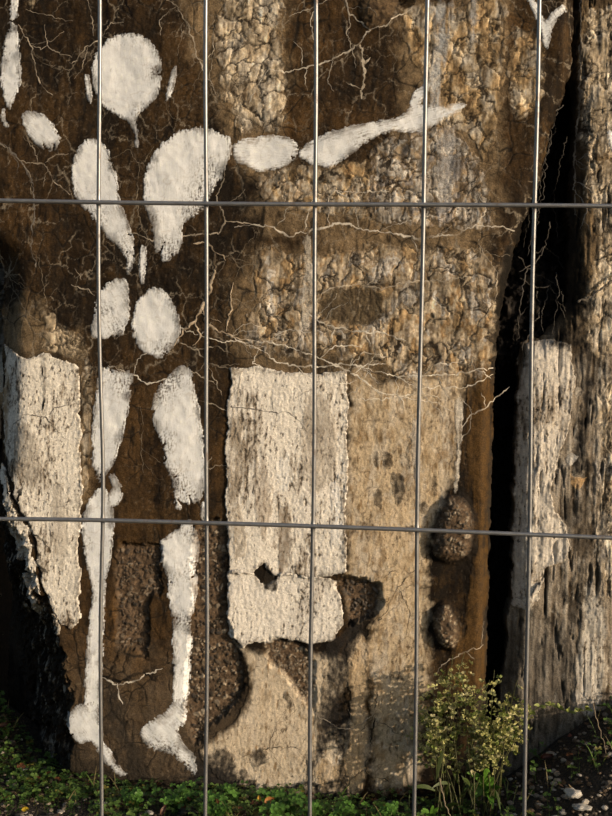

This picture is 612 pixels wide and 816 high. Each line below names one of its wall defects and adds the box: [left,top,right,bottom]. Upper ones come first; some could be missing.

crack [18,0,134,95]
crack [159,0,216,95]
water stain [427,0,456,108]
water stain [467,0,482,45]
water stain [433,117,462,228]
crack [572,0,601,241]
crack [0,140,70,346]
crack [174,170,515,445]
flaking render [185,0,549,801]
spalling [114,543,163,656]
water stain [262,562,279,592]
water stain [172,620,365,801]